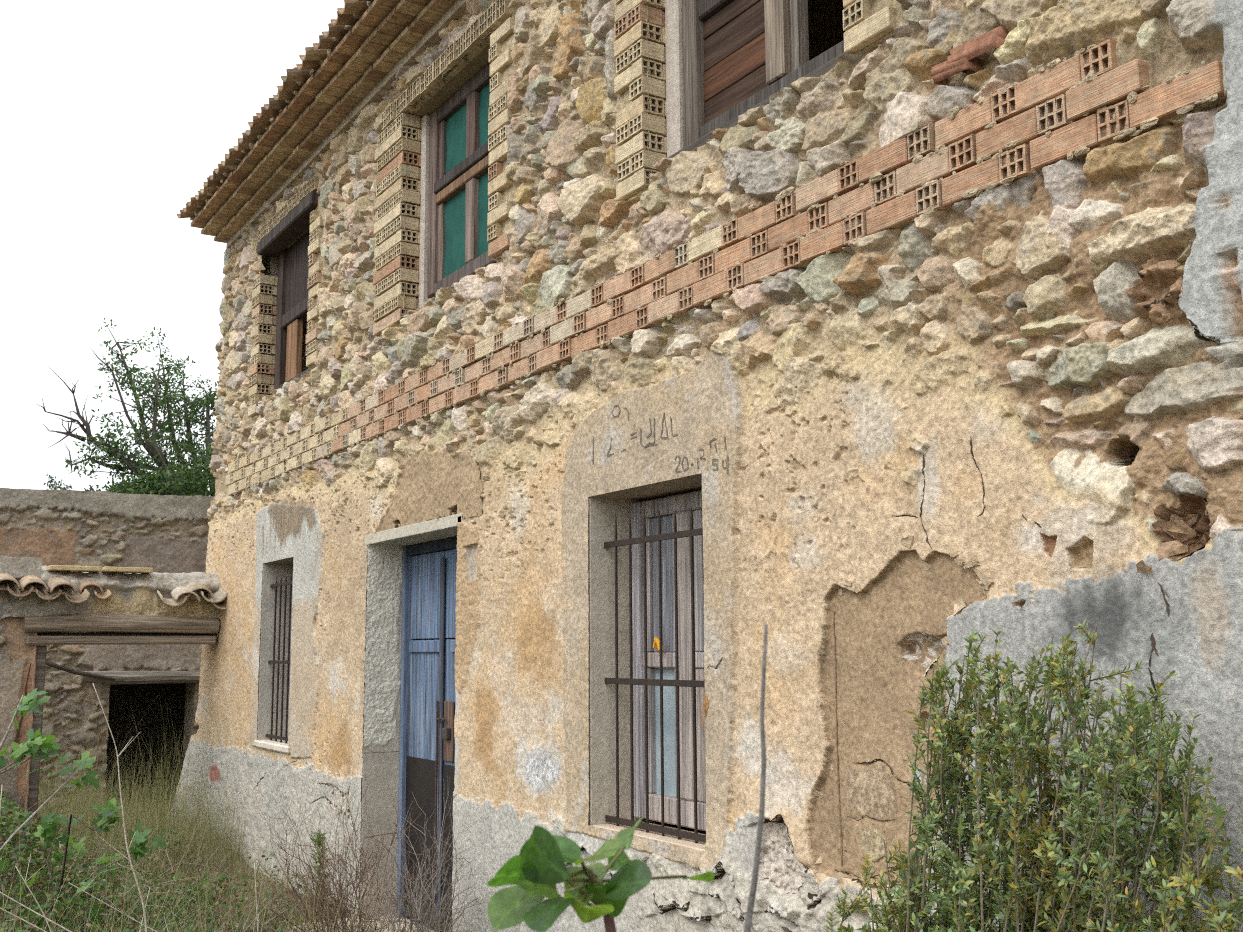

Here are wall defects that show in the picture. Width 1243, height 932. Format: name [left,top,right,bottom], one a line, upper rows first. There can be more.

crack [892,456,932,548]
crack [970,437,985,517]
spalling [1040,534,1094,568]
spalling [1136,493,1214,574]
peeling [758,536,993,895]